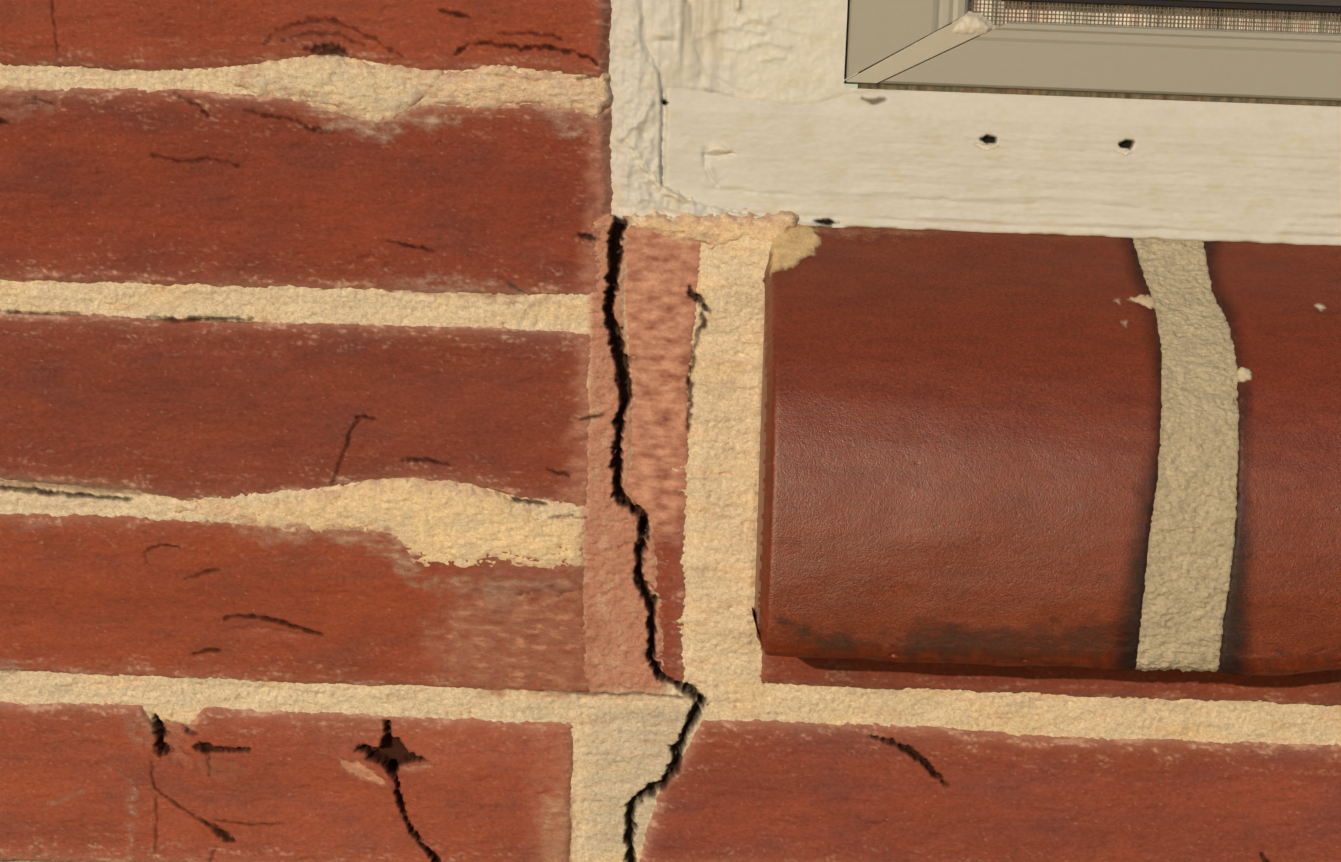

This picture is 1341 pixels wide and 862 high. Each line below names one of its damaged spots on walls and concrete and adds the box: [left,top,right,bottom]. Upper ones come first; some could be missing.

crack [687,286,708,427]
crack [584,219,704,862]
crack [194,615,321,654]
crack [872,736,945,782]
crack [154,783,235,841]